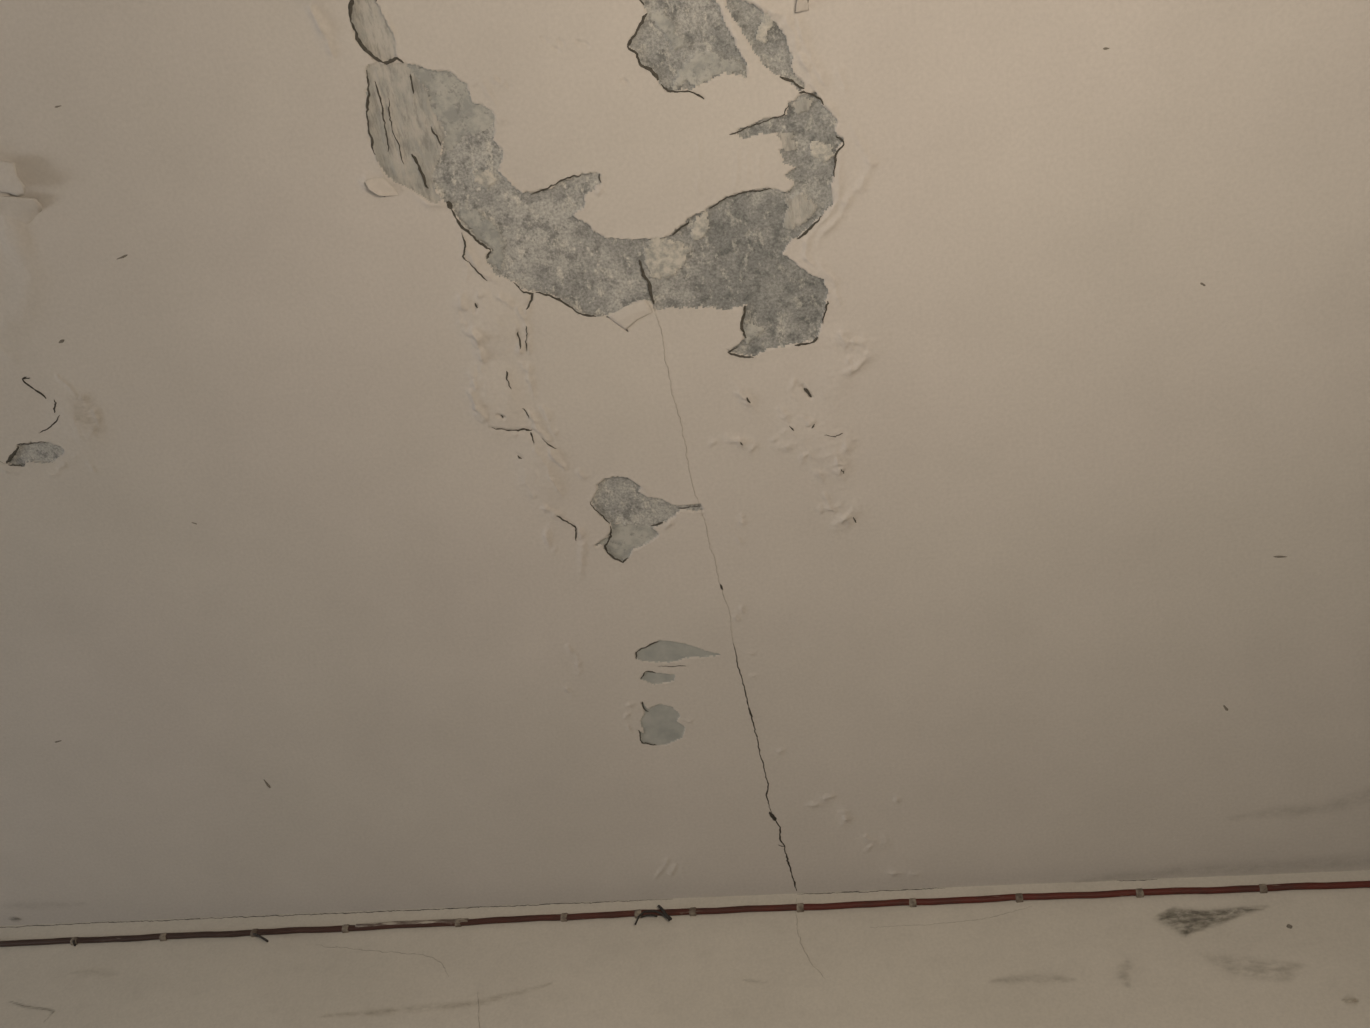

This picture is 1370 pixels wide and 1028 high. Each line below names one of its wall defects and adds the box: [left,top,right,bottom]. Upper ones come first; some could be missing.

peeling [336,0,883,369]
peeling [0,370,121,480]
peeling [578,467,717,570]
peeling [617,633,728,750]
crack [654,308,934,975]